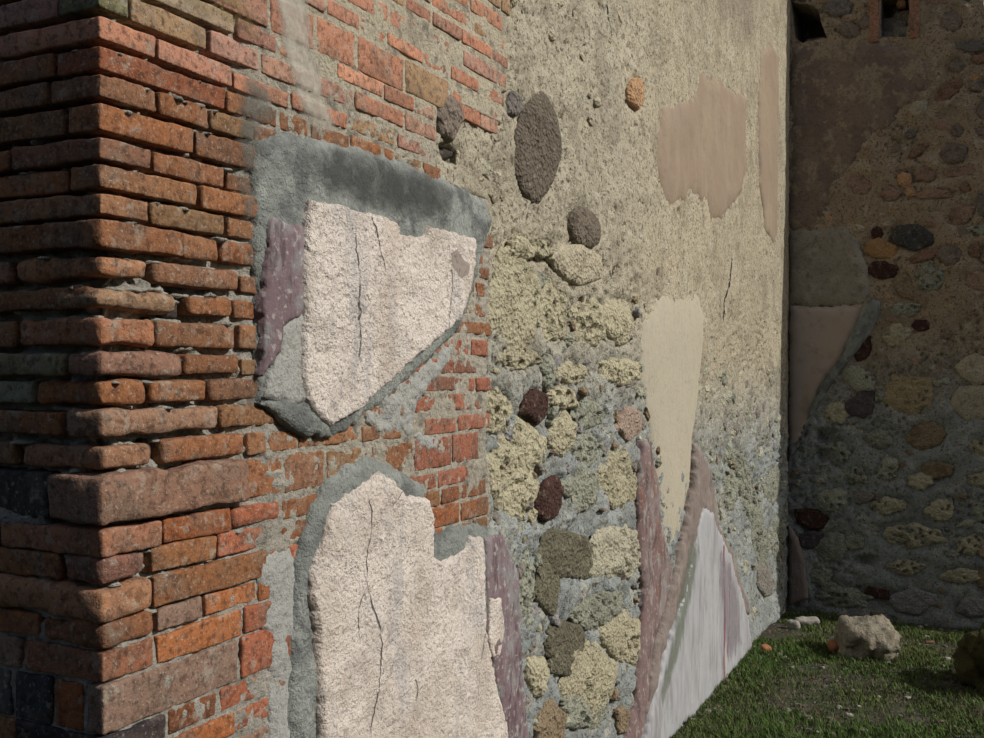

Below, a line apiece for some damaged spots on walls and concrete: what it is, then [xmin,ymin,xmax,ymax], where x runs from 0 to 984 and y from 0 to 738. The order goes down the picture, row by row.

peeling [248,129,492,439]
crack [356,216,386,357]
crack [358,488,403,727]